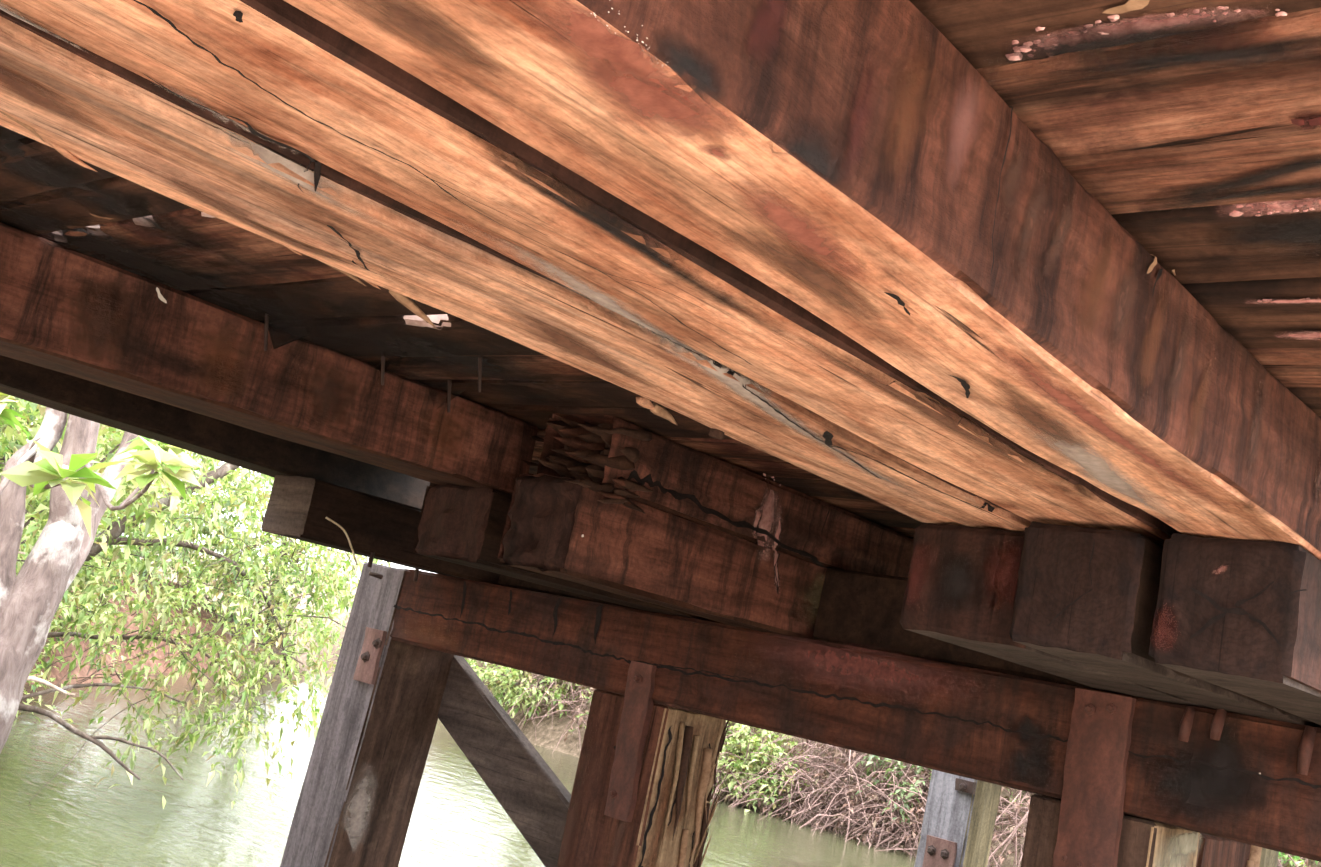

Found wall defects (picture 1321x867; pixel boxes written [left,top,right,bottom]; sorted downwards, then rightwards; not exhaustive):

water stain [1020,12,1312,73]
crack [133,0,997,512]
water stain [1164,158,1321,253]
crack [618,470,831,592]
crack [393,581,1068,742]
crack [638,727,695,867]
crack [1128,751,1321,789]